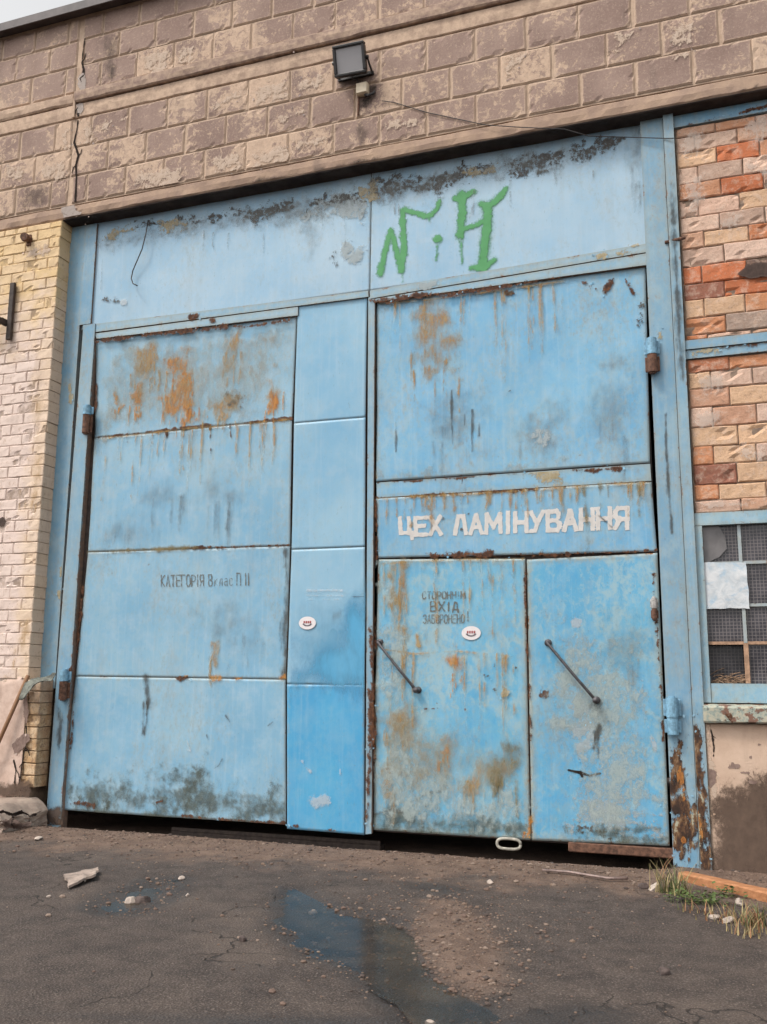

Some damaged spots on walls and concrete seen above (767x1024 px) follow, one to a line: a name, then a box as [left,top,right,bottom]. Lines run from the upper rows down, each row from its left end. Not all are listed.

crack [78,38,86,81]
crack [72,107,82,202]
peeling [104,129,626,242]
corrosion [369,277,560,343]
corrosion [96,312,295,457]
corrosion [374,465,647,560]
corrosion [429,549,494,573]
corrosion [66,586,84,672]
corrosion [365,561,435,827]
corrosion [463,744,520,814]
corrosion [660,715,712,870]
water stain [710,762,767,874]